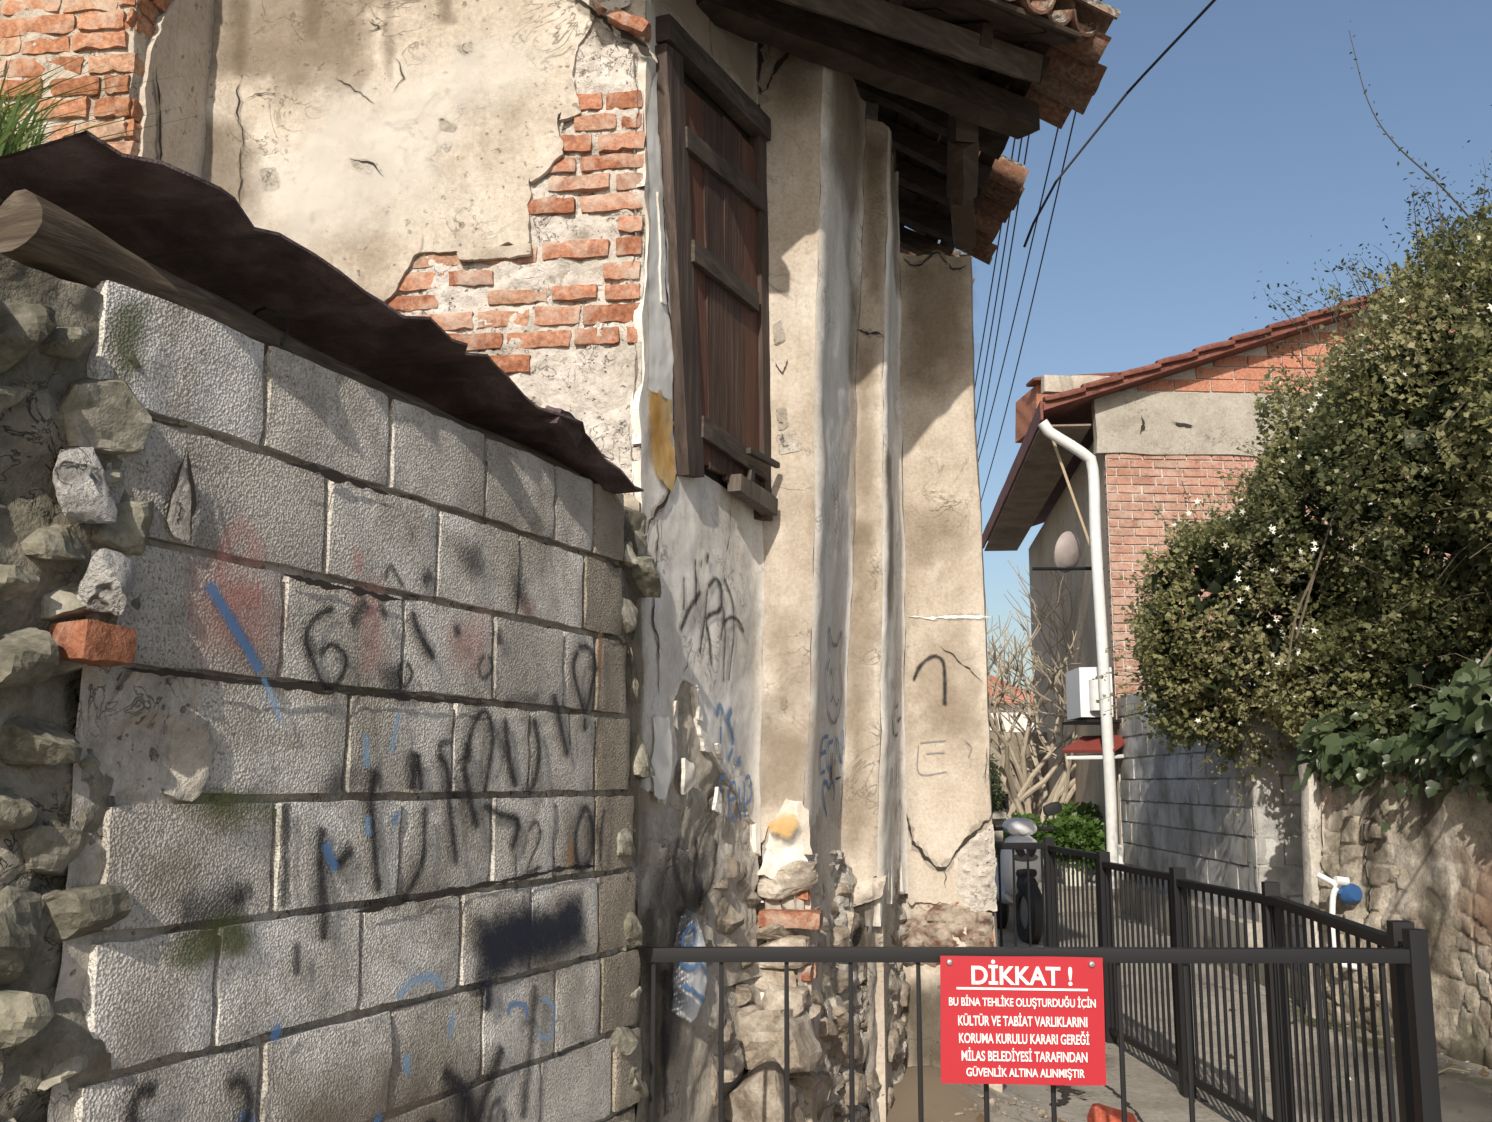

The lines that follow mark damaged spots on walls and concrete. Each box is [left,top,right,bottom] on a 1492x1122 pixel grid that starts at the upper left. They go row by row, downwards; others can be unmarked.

crack [574,0,657,63]
crack [155,67,163,161]
spalling [350,158,375,175]
spalling [386,18,674,495]
crack [599,472,693,694]
peeling [638,681,829,987]
spalling [852,875,888,907]
crack [906,750,994,887]